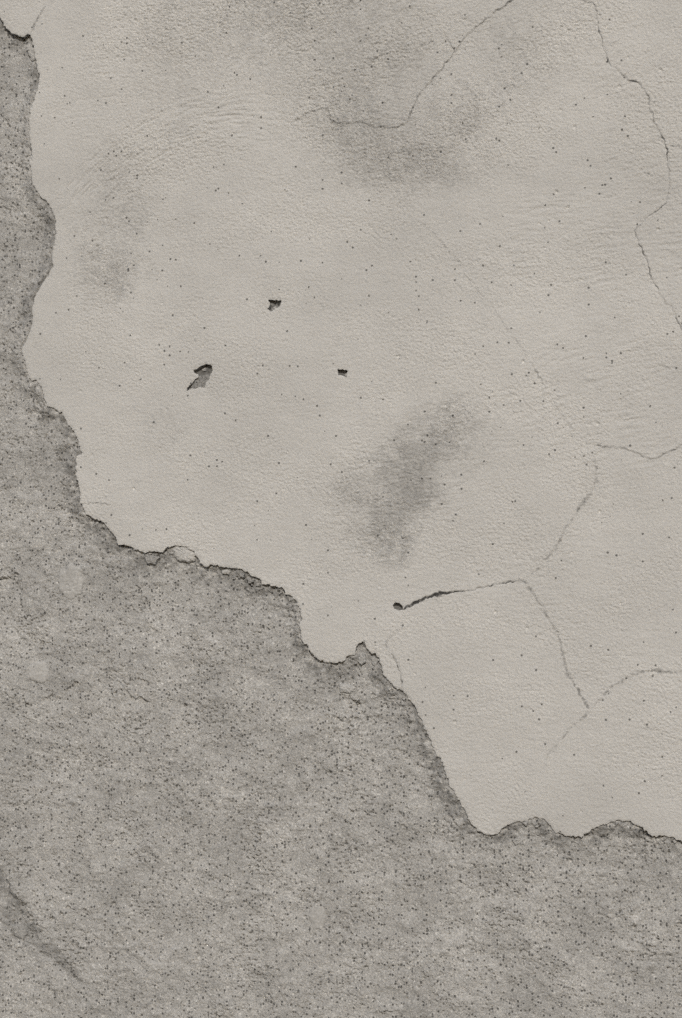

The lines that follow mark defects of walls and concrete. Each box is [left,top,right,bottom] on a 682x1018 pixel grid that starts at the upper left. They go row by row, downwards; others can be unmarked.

spalling [0,18,56,380]
spalling [268,300,281,311]
spalling [187,364,213,391]
spalling [88,522,316,670]
crack [404,581,513,609]
spalling [351,641,483,833]
spalling [496,818,650,846]